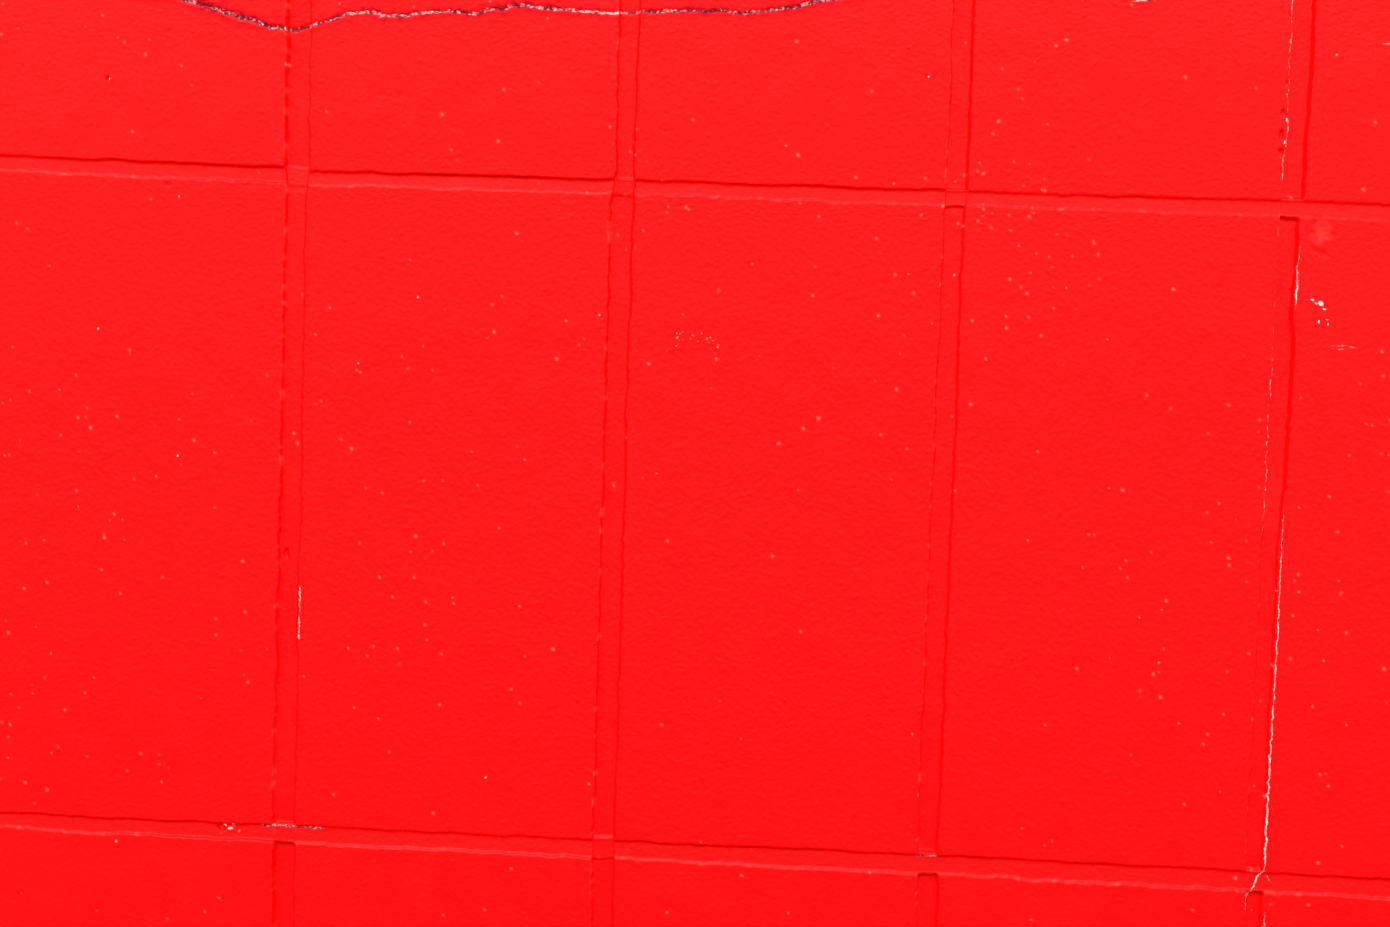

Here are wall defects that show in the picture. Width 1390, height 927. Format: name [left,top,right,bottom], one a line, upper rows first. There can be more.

crack [182,0,830,33]